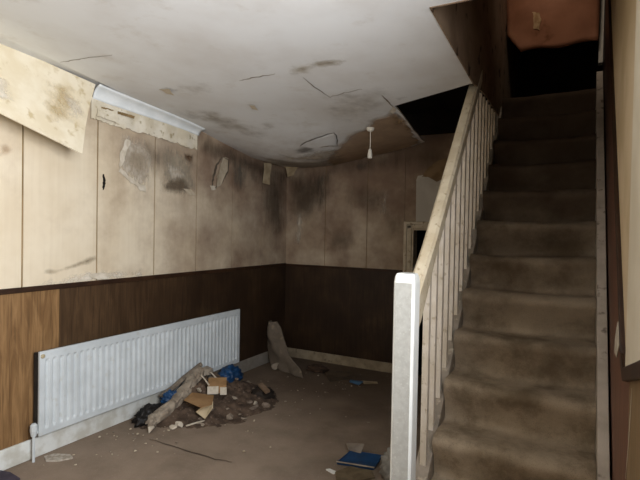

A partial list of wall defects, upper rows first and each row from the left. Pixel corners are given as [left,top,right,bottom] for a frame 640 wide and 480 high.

peeling [119,138,151,192]
water stain [165,154,195,196]